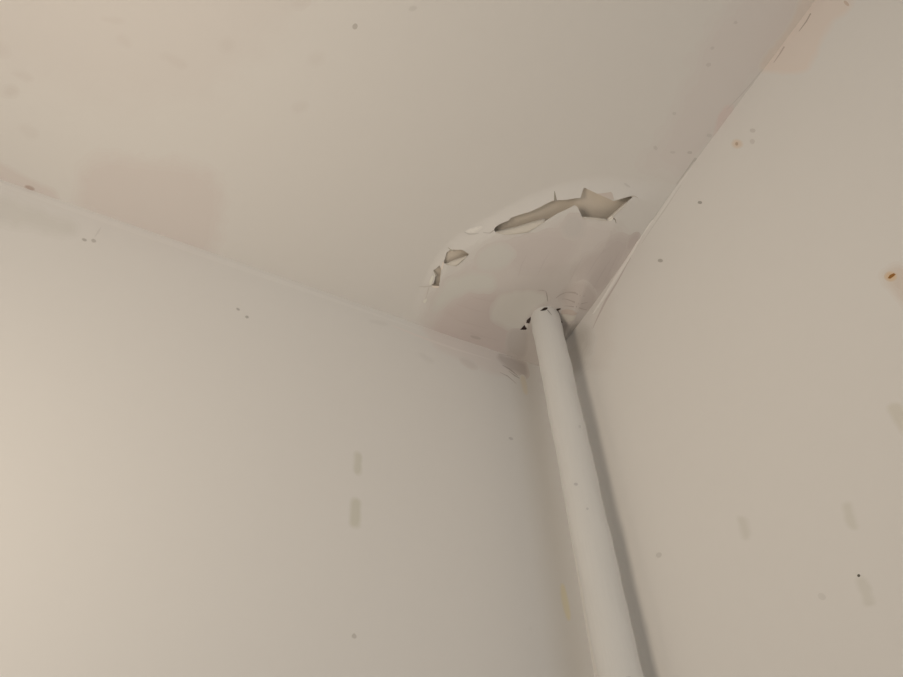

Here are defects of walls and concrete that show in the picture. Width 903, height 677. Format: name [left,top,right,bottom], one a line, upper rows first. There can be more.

peeling [404,174,676,323]
rust [884,271,898,282]